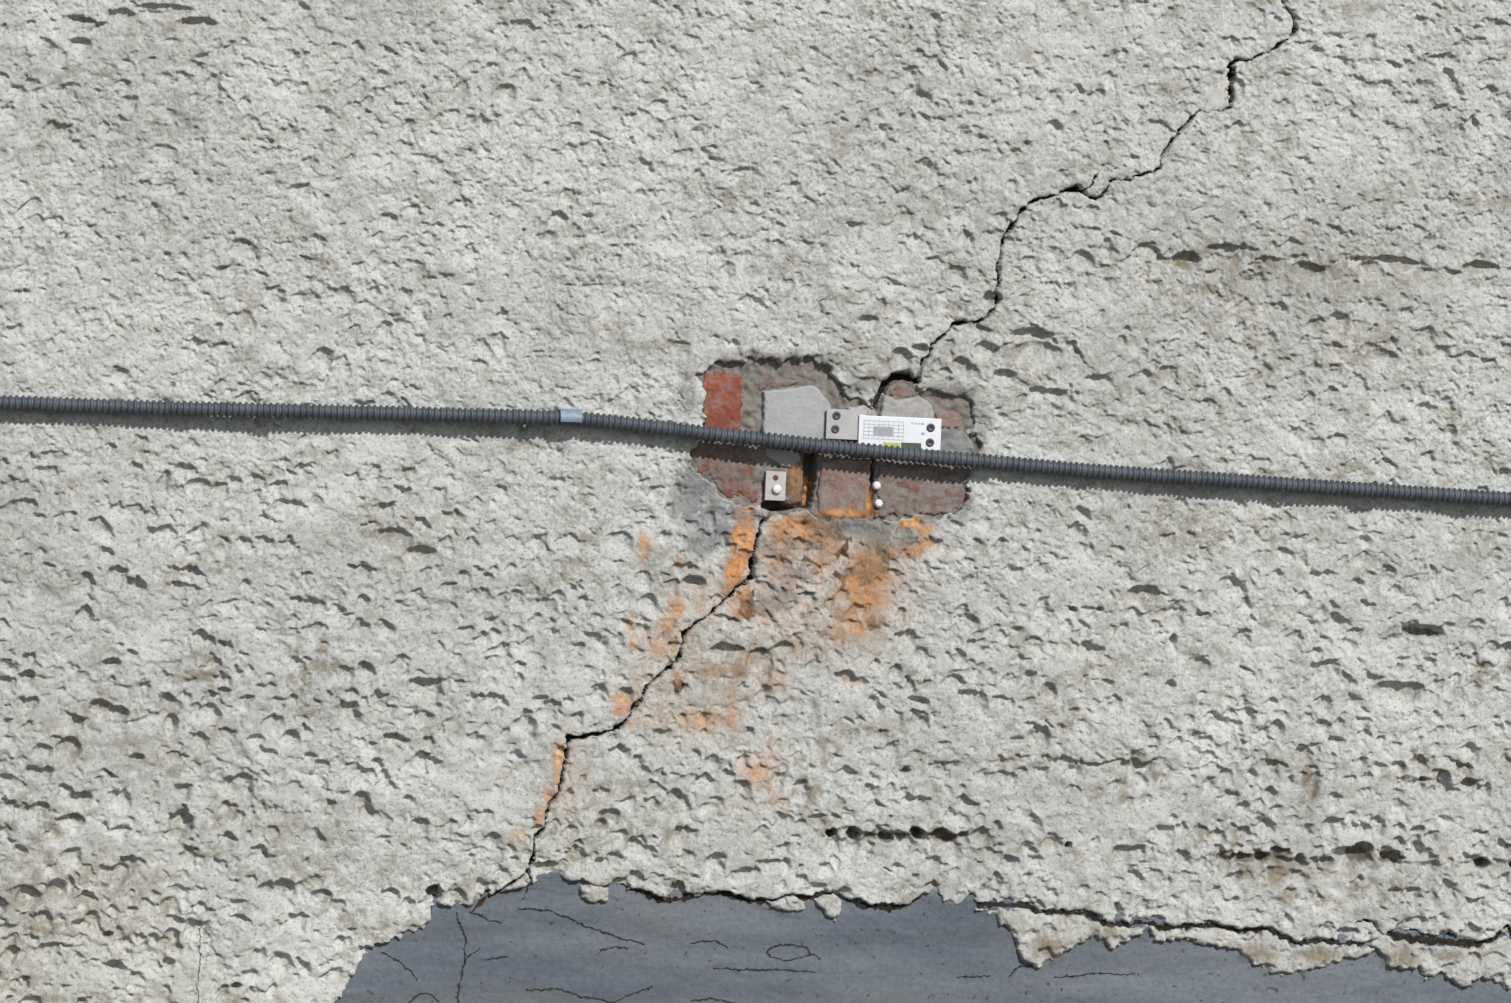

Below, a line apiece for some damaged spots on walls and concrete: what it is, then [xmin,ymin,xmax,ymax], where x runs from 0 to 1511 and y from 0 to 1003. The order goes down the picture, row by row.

crack [872,2,1298,407]
spalling [690,356,981,524]
corrosion [724,506,755,615]
corrosion [773,476,871,578]
corrosion [849,515,931,633]
crack [381,507,782,1003]
peeling [579,883,609,903]
peeling [766,893,842,922]
peeling [974,907,1511,990]
crack [977,901,1511,948]